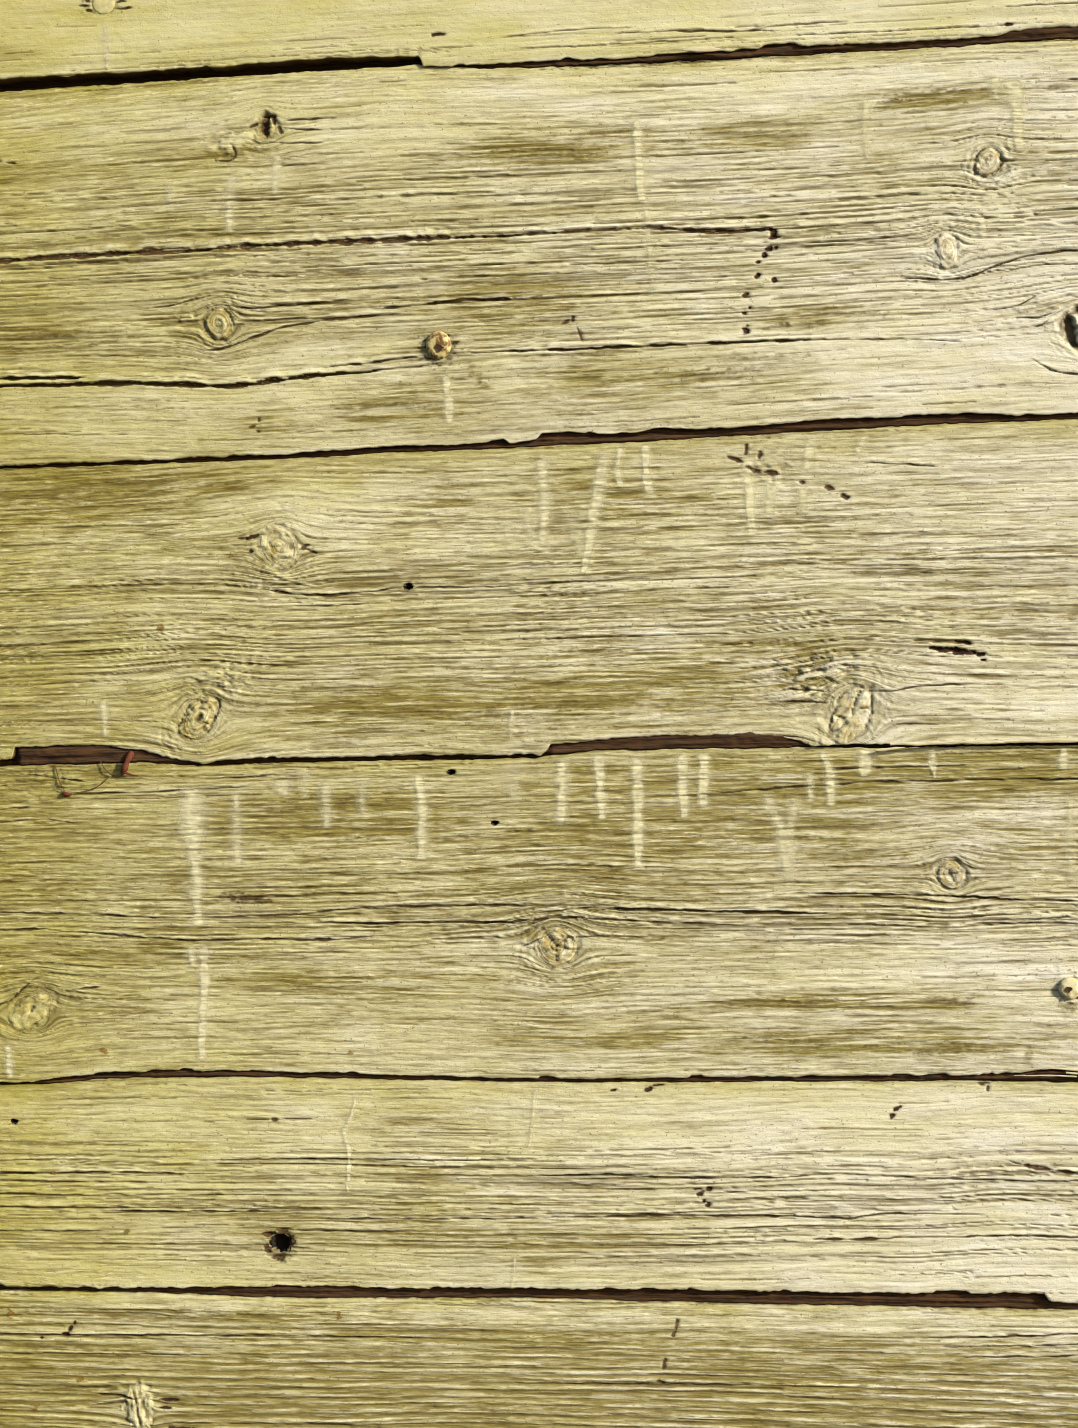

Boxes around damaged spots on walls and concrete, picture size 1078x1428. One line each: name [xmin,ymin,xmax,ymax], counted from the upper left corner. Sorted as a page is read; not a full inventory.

crack [0,297,512,389]
crack [472,339,809,353]
leakage [179,789,205,925]
leakage [414,776,428,859]
leakage [555,760,568,825]
leakage [593,756,606,819]
leakage [632,760,644,869]
leakage [677,754,709,817]
leakage [766,754,835,888]
leakage [859,748,873,776]
leakage [1058,749,1068,769]
leakage [188,947,210,1059]